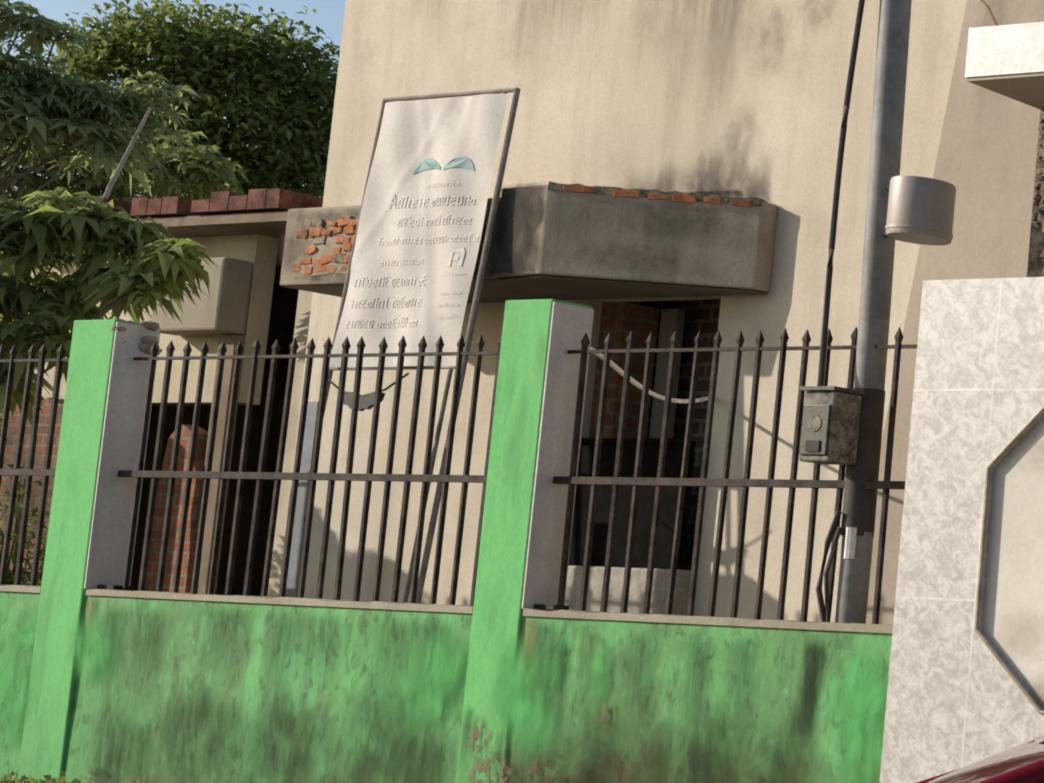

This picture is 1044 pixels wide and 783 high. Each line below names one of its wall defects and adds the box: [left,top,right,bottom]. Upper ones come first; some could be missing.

flaking render [548,181,767,208]
spalling [293,216,358,276]
damp [839,660,883,783]